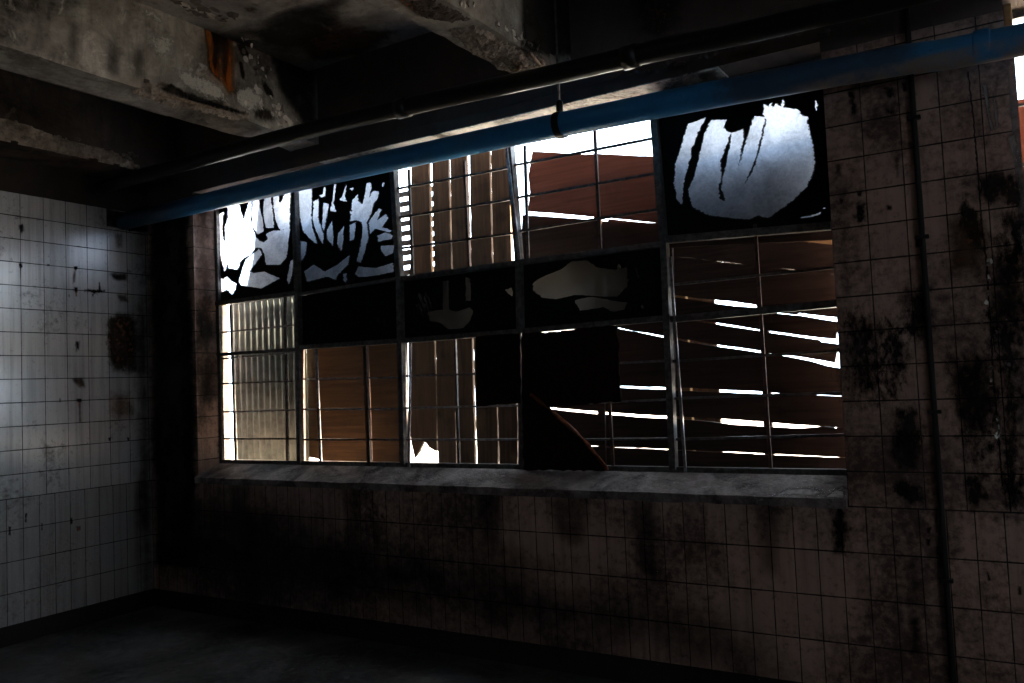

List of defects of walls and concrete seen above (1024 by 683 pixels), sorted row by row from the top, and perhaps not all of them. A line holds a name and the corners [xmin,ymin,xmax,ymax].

spalling [132,37,298,127]
rust [205,29,235,93]
damp [108,295,137,372]
damp [948,171,1024,513]
damp [893,407,924,504]